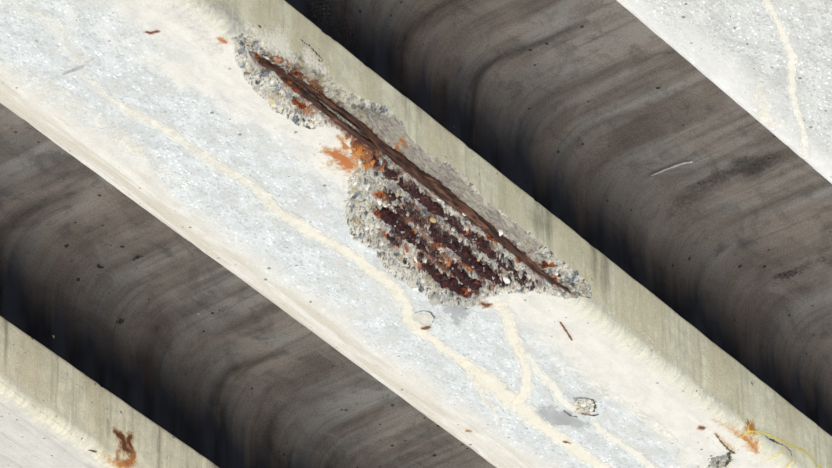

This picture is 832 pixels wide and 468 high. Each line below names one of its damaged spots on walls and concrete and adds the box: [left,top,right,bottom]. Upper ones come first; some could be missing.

spalling [227,23,595,313]
spalling [564,395,601,419]
rust [109,429,136,468]
spalling [702,434,735,468]
rust [735,419,759,453]